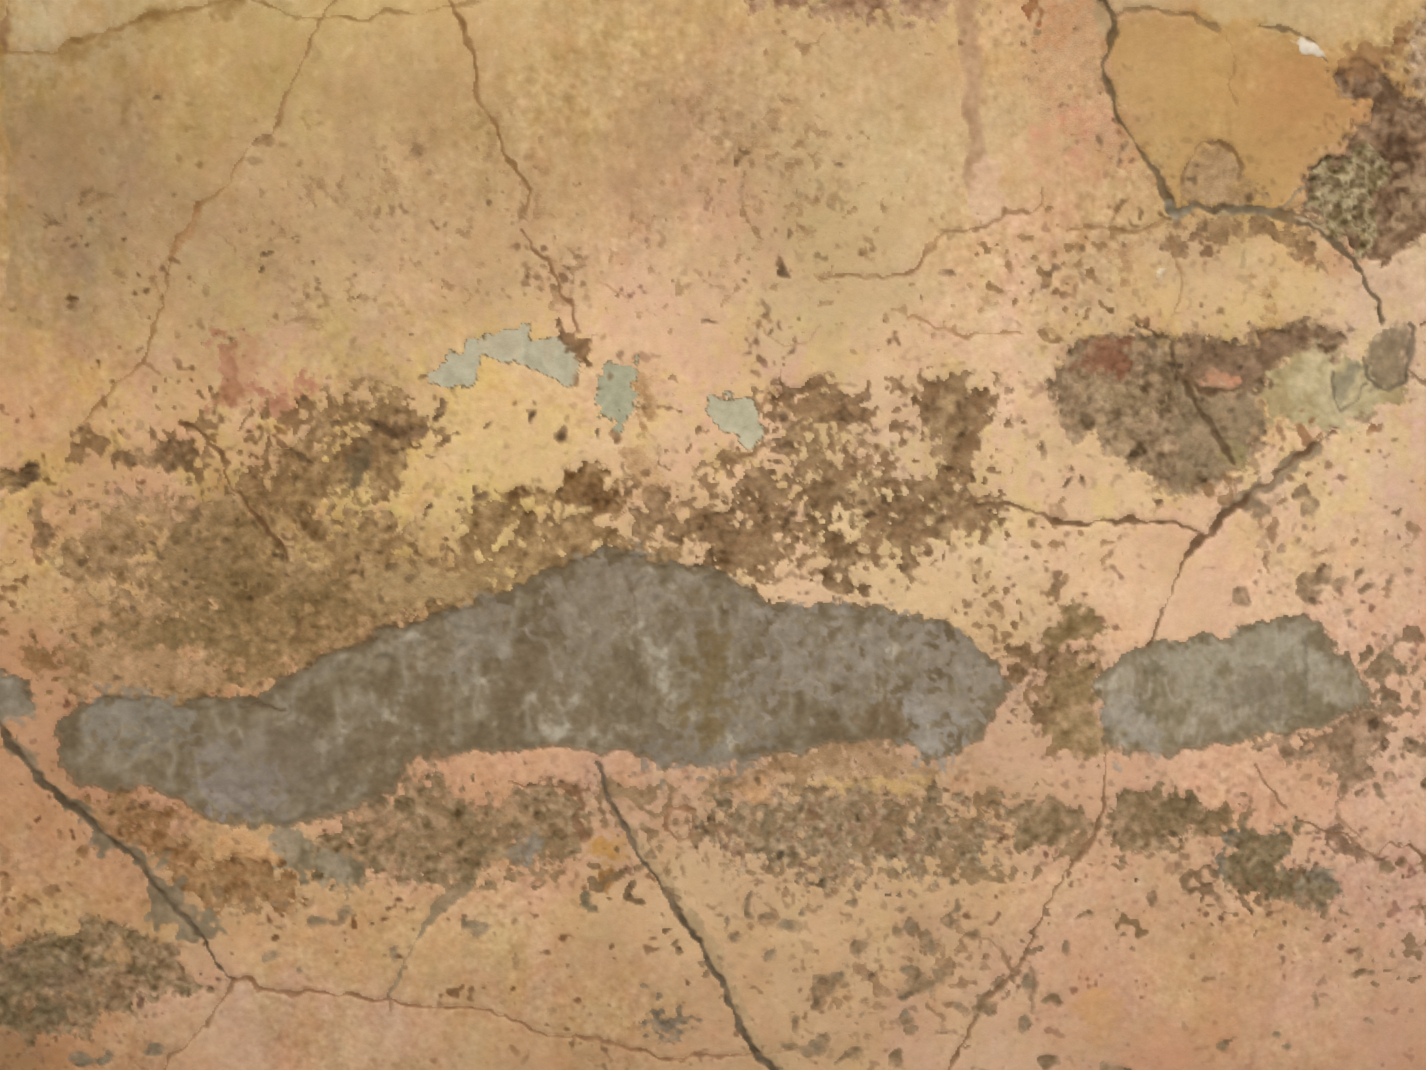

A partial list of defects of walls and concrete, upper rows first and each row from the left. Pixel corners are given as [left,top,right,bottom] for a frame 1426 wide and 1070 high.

spalling [744,0,1002,58]
spalling [213,178,337,351]
crack [0,0,630,432]
spalling [287,99,587,314]
spalling [597,74,910,343]
crack [819,0,1426,649]
spalling [937,0,1426,516]
crack [177,419,291,565]
crack [0,721,802,1070]
spalling [0,283,1426,1070]
crack [948,751,1109,1070]
crack [1254,763,1426,864]